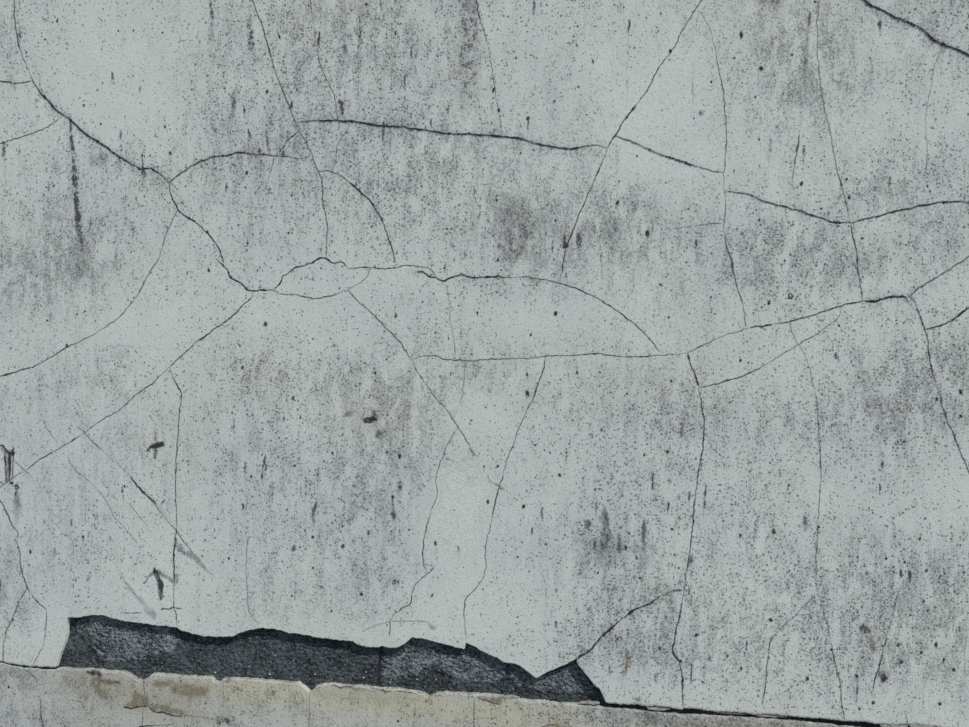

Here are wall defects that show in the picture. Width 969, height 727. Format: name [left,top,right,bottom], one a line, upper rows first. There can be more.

crack [863,0,969,64]
crack [0,0,724,635]
crack [415,162,969,727]
crack [0,477,57,677]
peeling [124,691,185,717]
spalling [57,615,605,705]